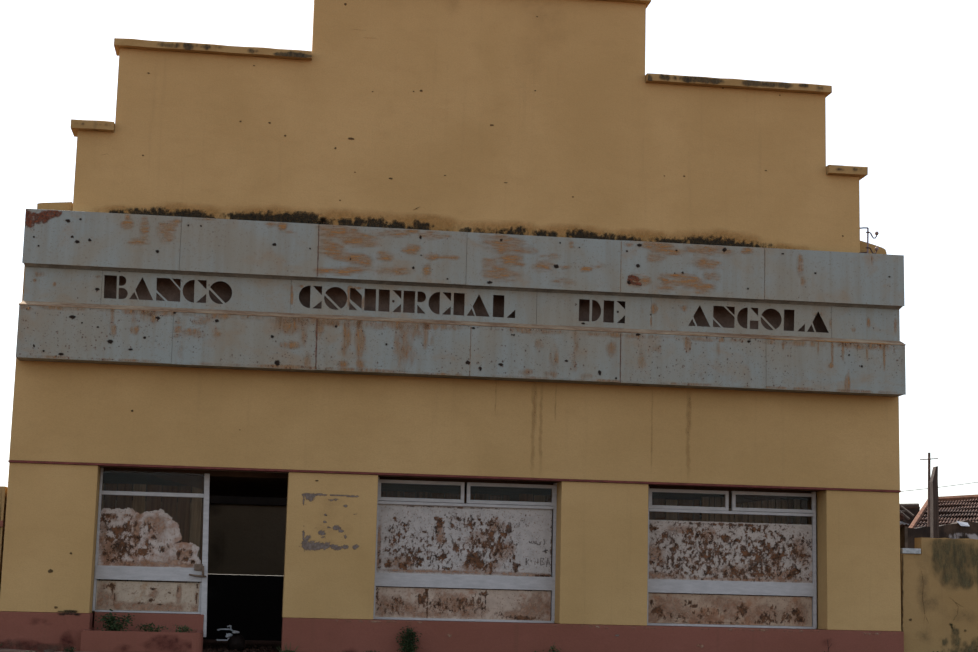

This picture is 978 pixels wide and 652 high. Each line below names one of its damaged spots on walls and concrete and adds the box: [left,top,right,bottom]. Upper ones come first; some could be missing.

water stain [109,208,791,249]
peeling [302,493,358,515]
peeling [100,513,195,565]
peeling [301,514,359,550]
peeling [378,505,526,575]
peeling [649,522,812,583]
water stain [933,539,978,588]
peeling [415,589,488,623]
peeling [650,600,805,631]